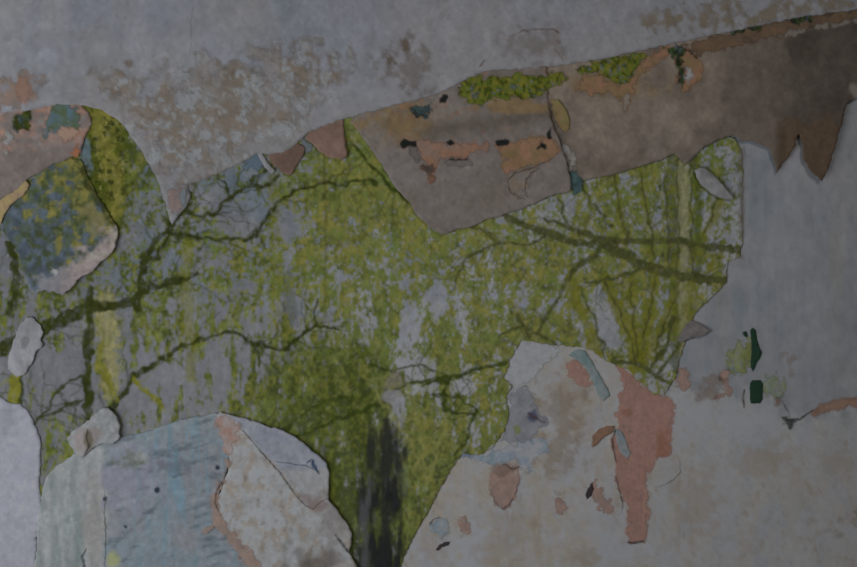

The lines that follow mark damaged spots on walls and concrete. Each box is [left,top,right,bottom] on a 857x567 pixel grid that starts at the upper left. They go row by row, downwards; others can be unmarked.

peeling [0,104,118,295]
spalling [91,37,356,223]
peeling [351,9,857,234]
peeling [0,397,357,567]
peeling [429,516,471,551]
peeling [461,341,676,544]